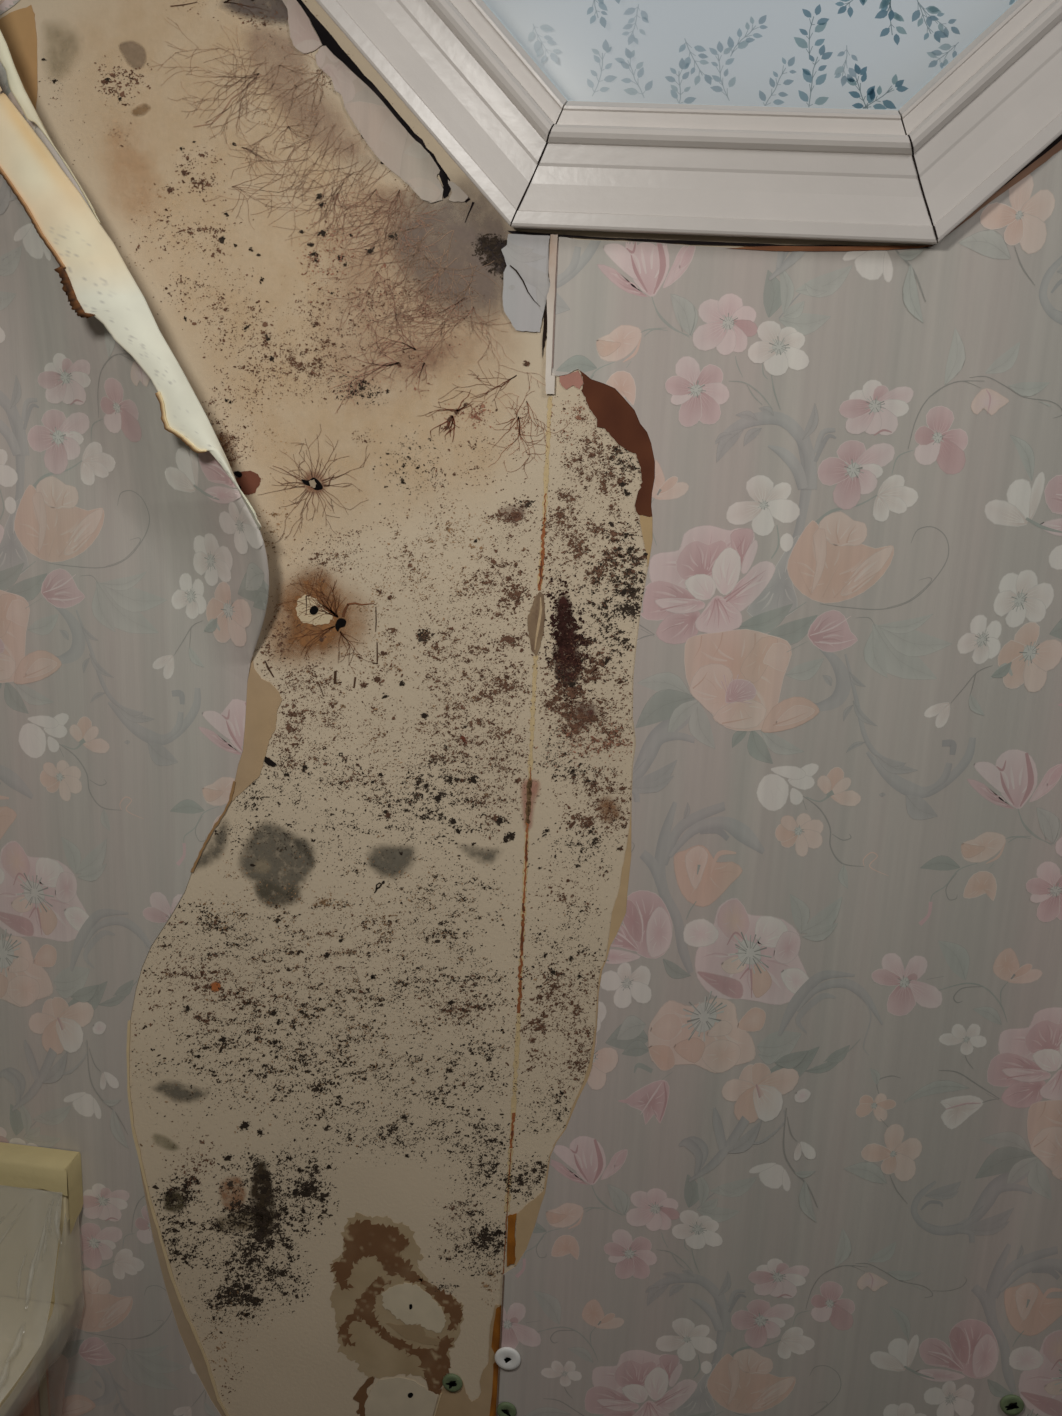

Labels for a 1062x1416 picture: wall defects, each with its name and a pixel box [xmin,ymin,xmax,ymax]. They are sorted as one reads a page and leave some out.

leakage [39,0,648,1403]
peeling [330,1212,464,1416]